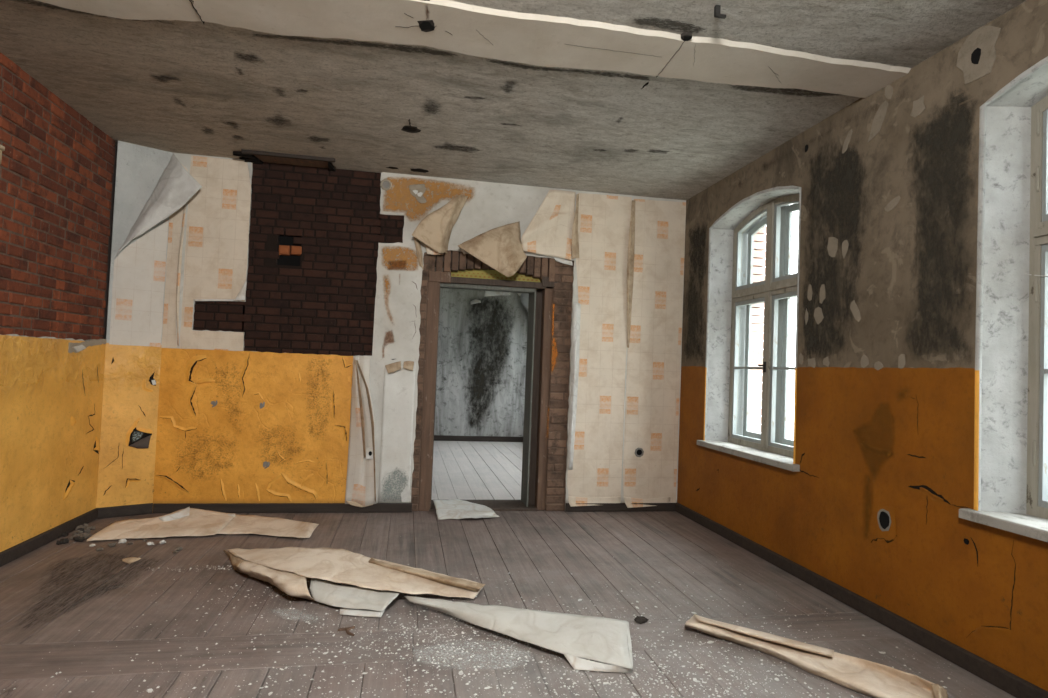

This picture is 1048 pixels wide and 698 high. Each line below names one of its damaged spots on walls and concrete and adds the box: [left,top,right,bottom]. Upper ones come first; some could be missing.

flaking render [0,52,202,353]
flaking render [193,162,427,409]
mould [803,146,865,358]
mould [909,95,973,357]
peeling [125,418,152,446]
peeling [159,355,215,439]
peeling [255,451,328,502]
mould [468,297,513,428]
crack [908,485,968,523]